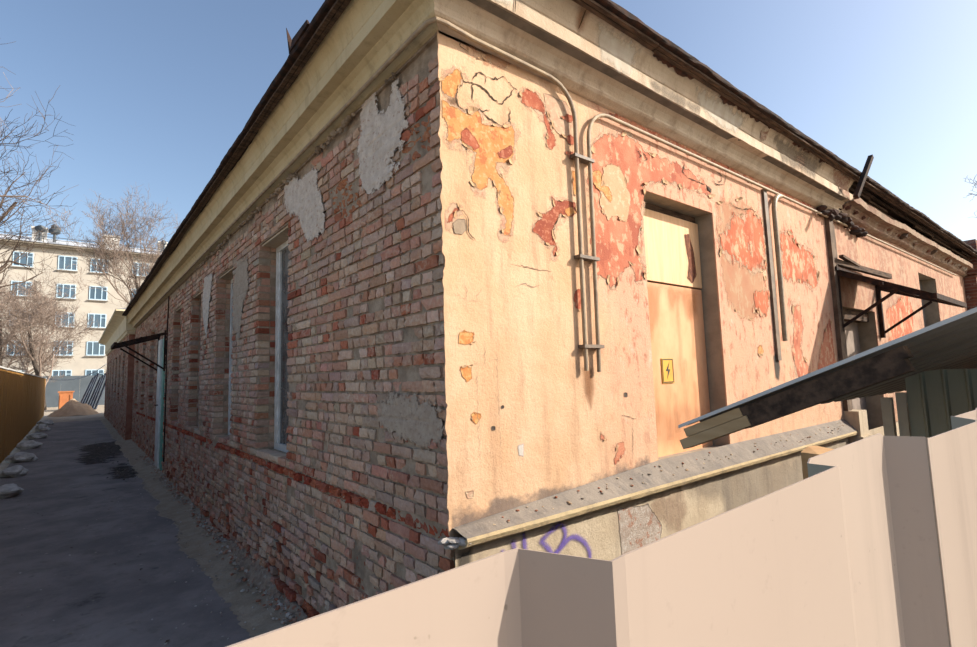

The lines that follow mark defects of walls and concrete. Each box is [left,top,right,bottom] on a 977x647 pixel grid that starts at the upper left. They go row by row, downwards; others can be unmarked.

crack [456,42,517,126]
peeling [439,66,521,242]
peeling [516,88,820,320]
peeling [460,364,473,382]
peeling [459,329,476,345]
peeling [791,301,836,377]
peeling [886,296,914,341]